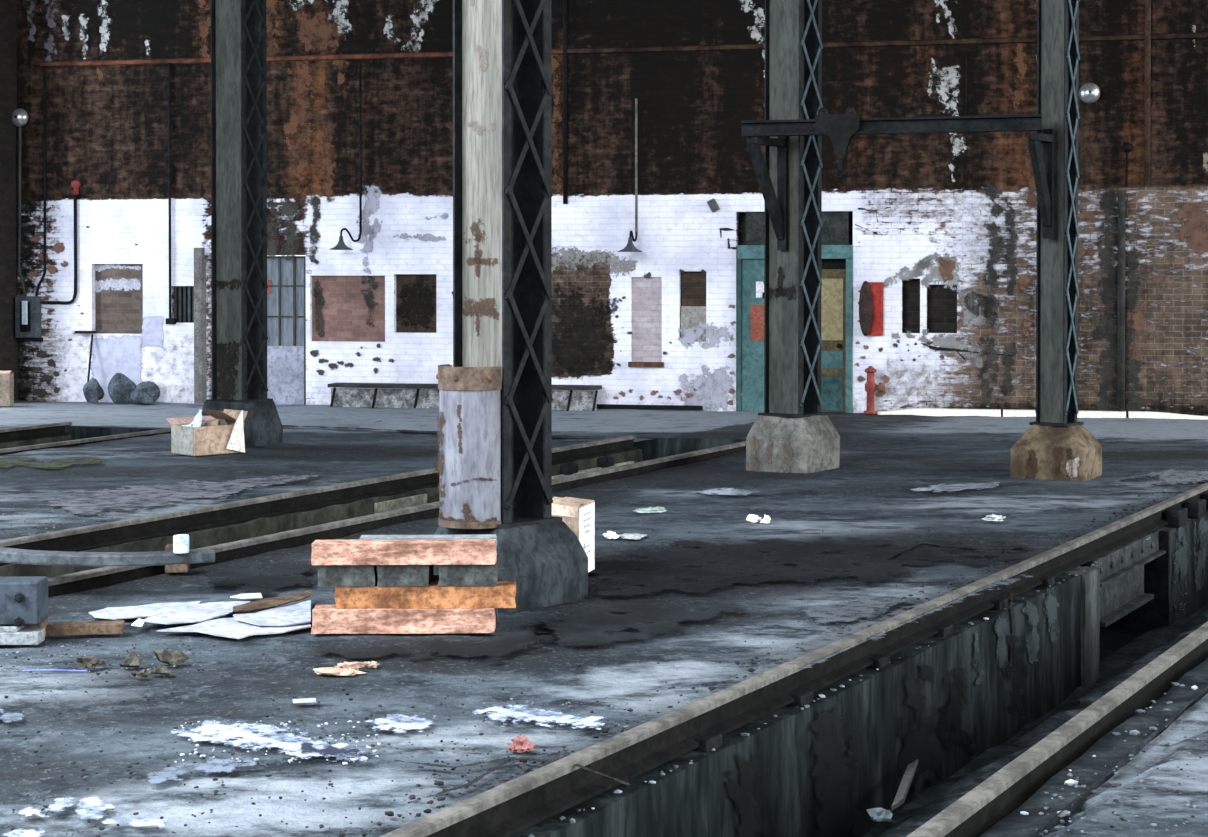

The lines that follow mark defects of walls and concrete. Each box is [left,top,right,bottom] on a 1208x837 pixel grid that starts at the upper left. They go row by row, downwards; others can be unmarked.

rust [266,0,350,203]
peeling [27,218,68,286]
damp [964,182,1019,405]
spalling [1078,208,1098,223]
spalling [1176,203,1208,255]
peeling [22,345,67,398]
peeling [727,305,736,405]
rust [435,405,498,522]
spalling [510,492,1208,837]